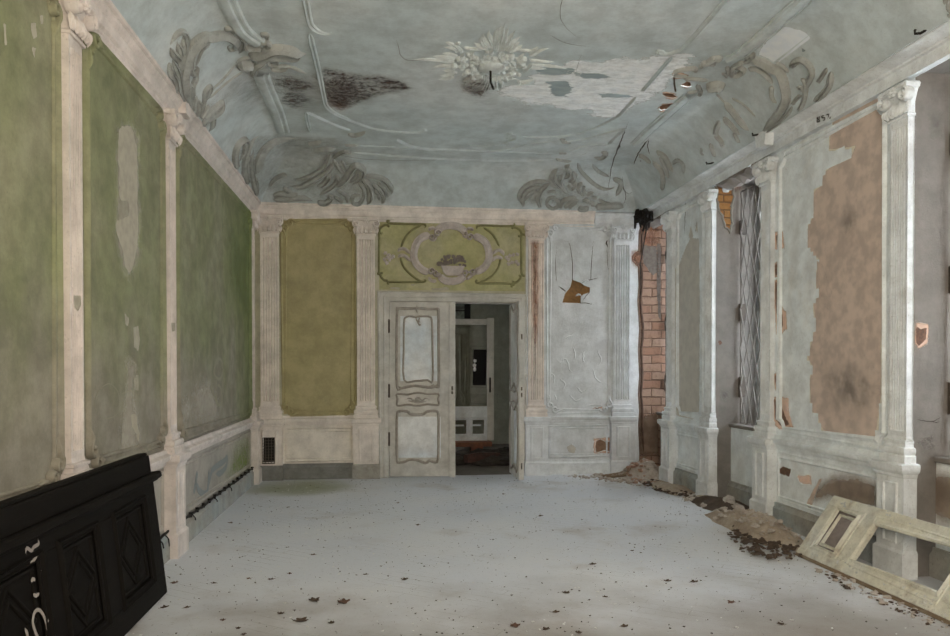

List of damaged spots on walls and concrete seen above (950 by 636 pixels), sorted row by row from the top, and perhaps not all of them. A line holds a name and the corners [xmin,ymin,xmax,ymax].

peeling [500,53,695,118]
peeling [115,123,141,274]
flaking render [714,163,757,233]
spalling [555,241,597,304]
peeling [807,99,882,436]
peeling [125,314,140,351]
spalling [915,323,929,348]
spalling [593,438,610,453]